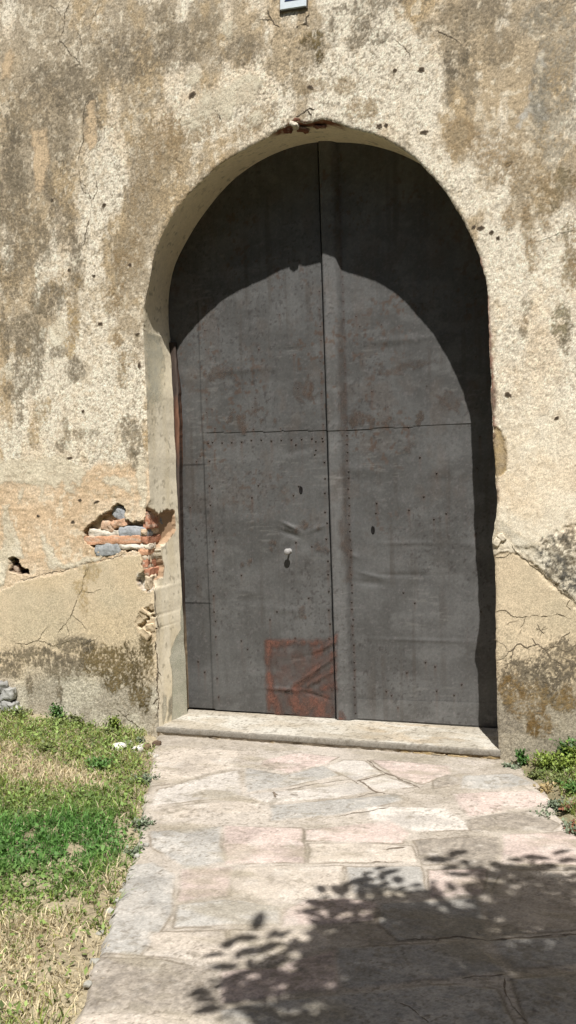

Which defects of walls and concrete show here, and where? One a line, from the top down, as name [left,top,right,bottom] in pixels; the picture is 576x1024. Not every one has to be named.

leakage [445,47,576,271]
leakage [0,103,85,419]
leakage [563,223,576,291]
leakage [113,332,163,400]
leakage [551,304,574,355]
peeling [0,487,30,586]
crack [11,554,122,646]
flaking render [40,503,163,644]
crack [494,544,574,667]
peeling [494,522,576,596]
leakage [0,636,102,703]
leakage [498,637,576,707]